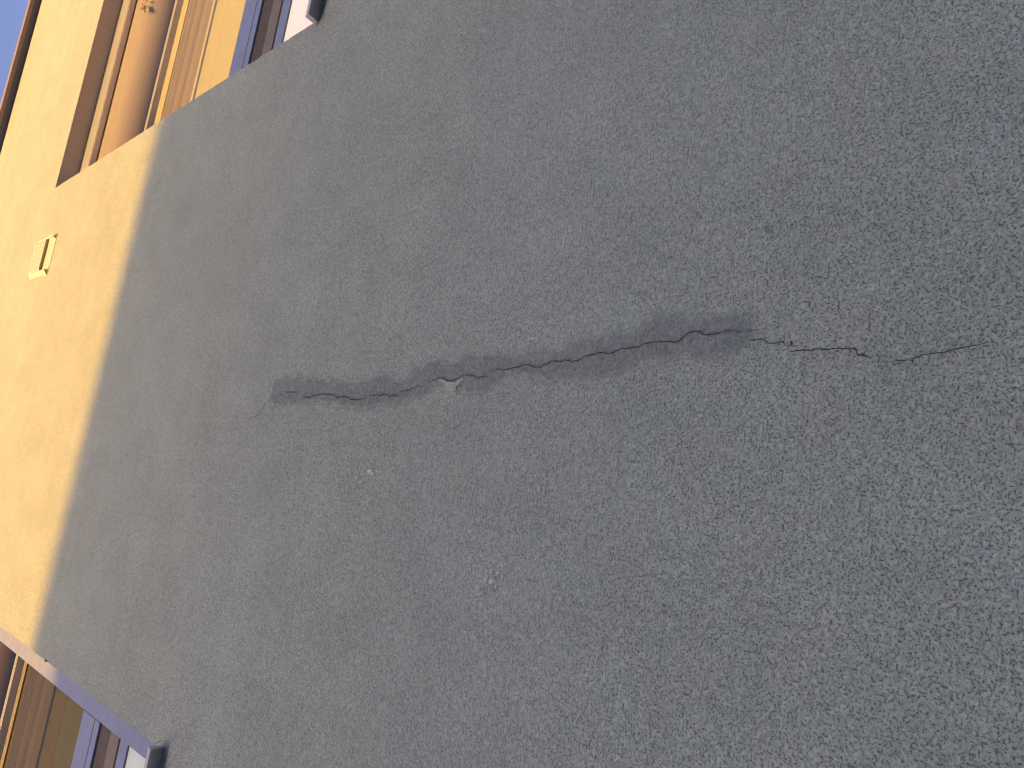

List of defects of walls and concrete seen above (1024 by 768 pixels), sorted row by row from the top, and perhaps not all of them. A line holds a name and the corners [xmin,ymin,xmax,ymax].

leakage [271,316,748,408]
crack [248,329,992,420]